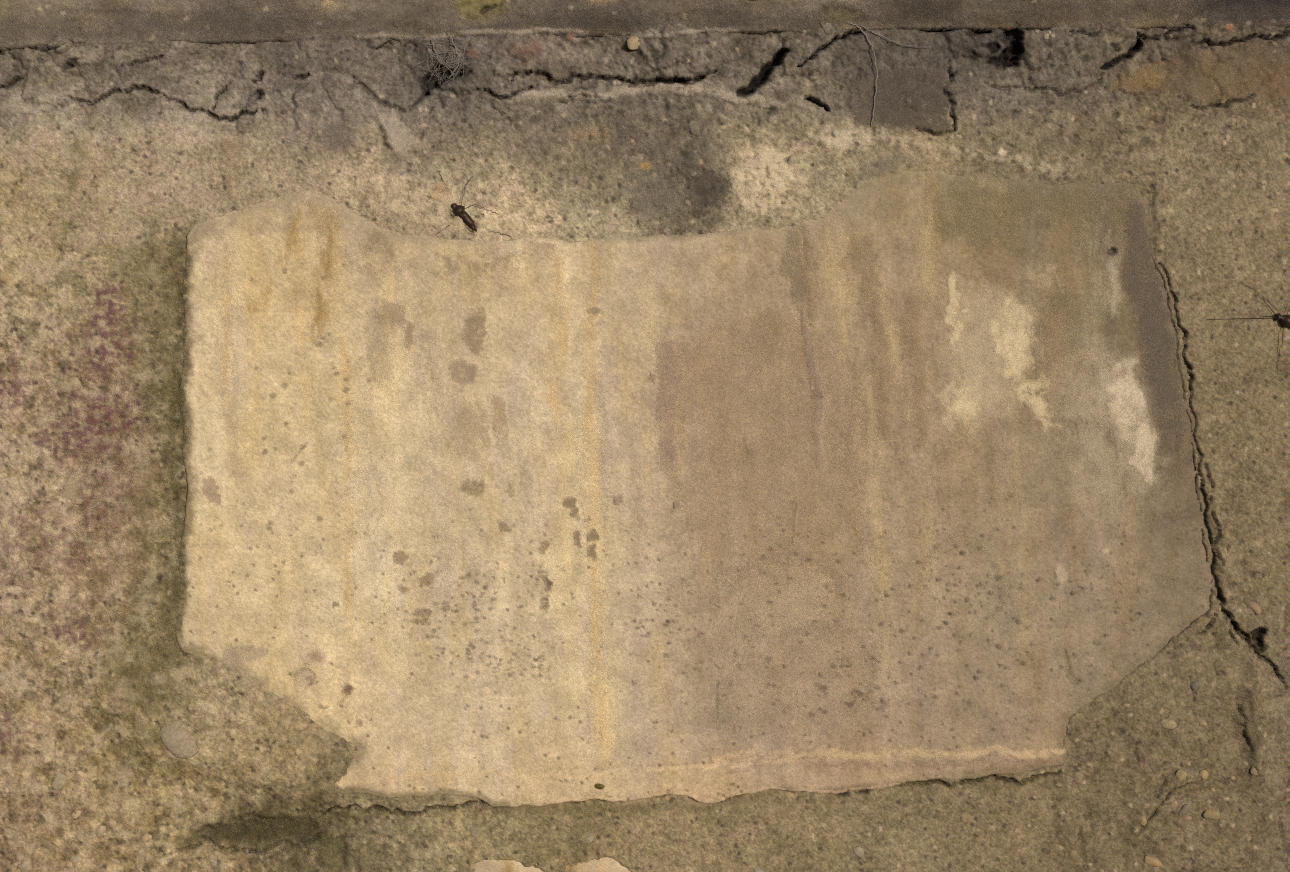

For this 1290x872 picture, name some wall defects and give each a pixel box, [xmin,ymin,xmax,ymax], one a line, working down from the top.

crack [69,55,310,121]
crack [477,32,861,112]
crack [986,25,1290,96]
efflorescence [732,147,800,213]
efflorescence [821,130,904,149]
efflorescence [988,149,1061,174]
leakage [939,184,1185,497]
crack [1162,270,1286,688]
crack [901,770,1060,788]
crack [155,801,485,855]
peeling [474,852,543,872]
peeling [575,857,630,872]